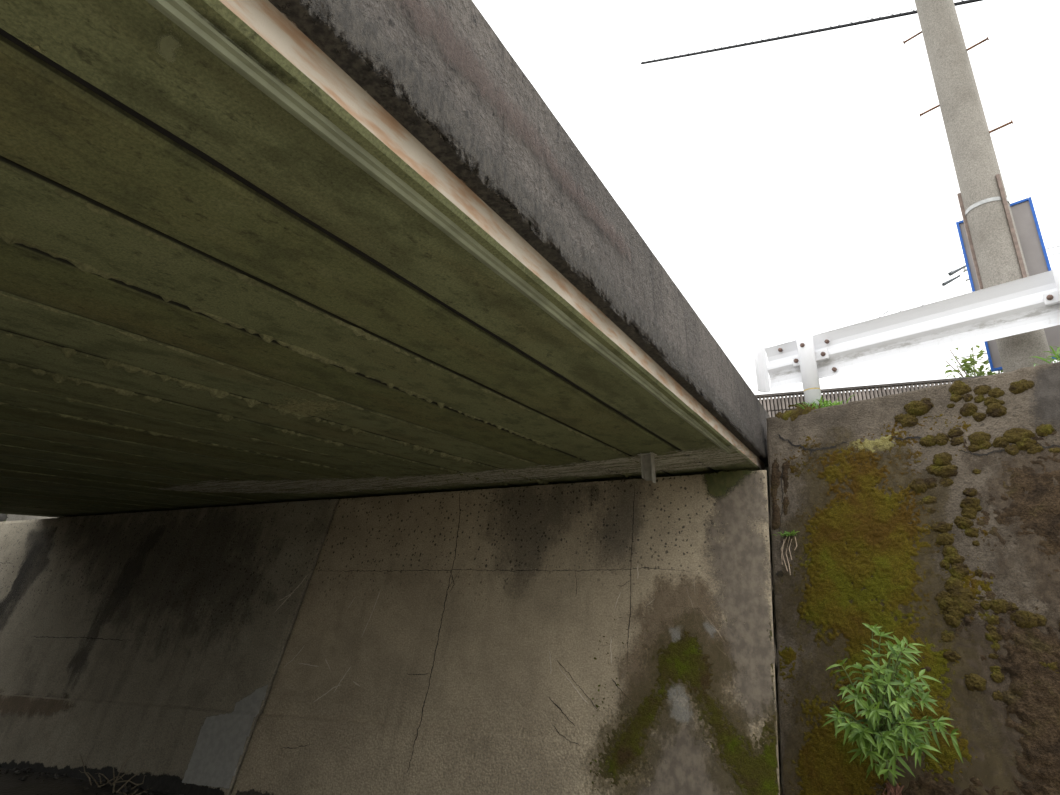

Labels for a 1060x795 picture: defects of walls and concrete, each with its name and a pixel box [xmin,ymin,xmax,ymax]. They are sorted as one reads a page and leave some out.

damp [0,528,57,628]
damp [152,455,641,494]
crack [316,488,690,772]
damp [610,445,776,724]